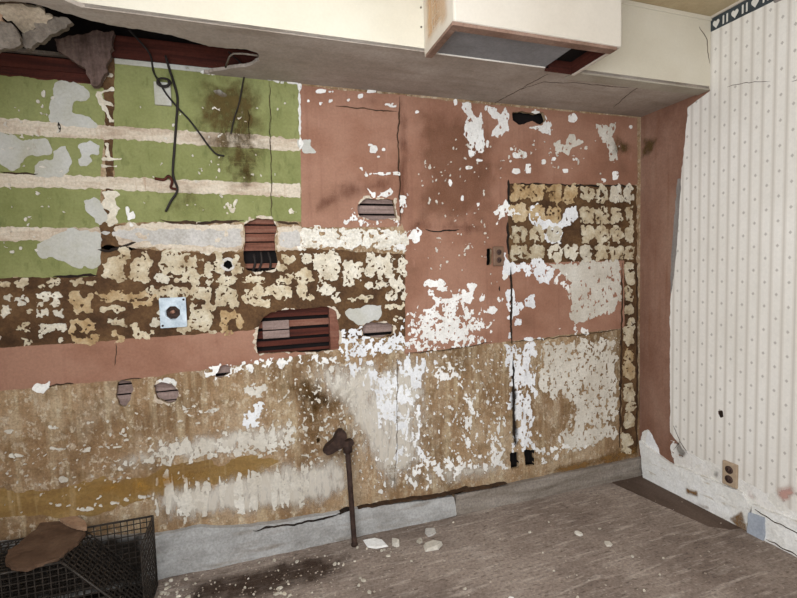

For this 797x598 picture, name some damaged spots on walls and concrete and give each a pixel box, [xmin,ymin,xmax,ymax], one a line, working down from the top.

damp [203,87,257,181]
peeling [418,99,620,187]
flaking render [0,216,101,253]
spalling [243,215,280,275]
spalling [343,188,408,230]
peeling [394,227,422,250]
peeling [493,199,578,244]
peeling [0,237,622,524]
peeling [641,430,660,454]
peeling [670,440,726,485]
damp [163,460,344,518]
crack [257,481,507,531]